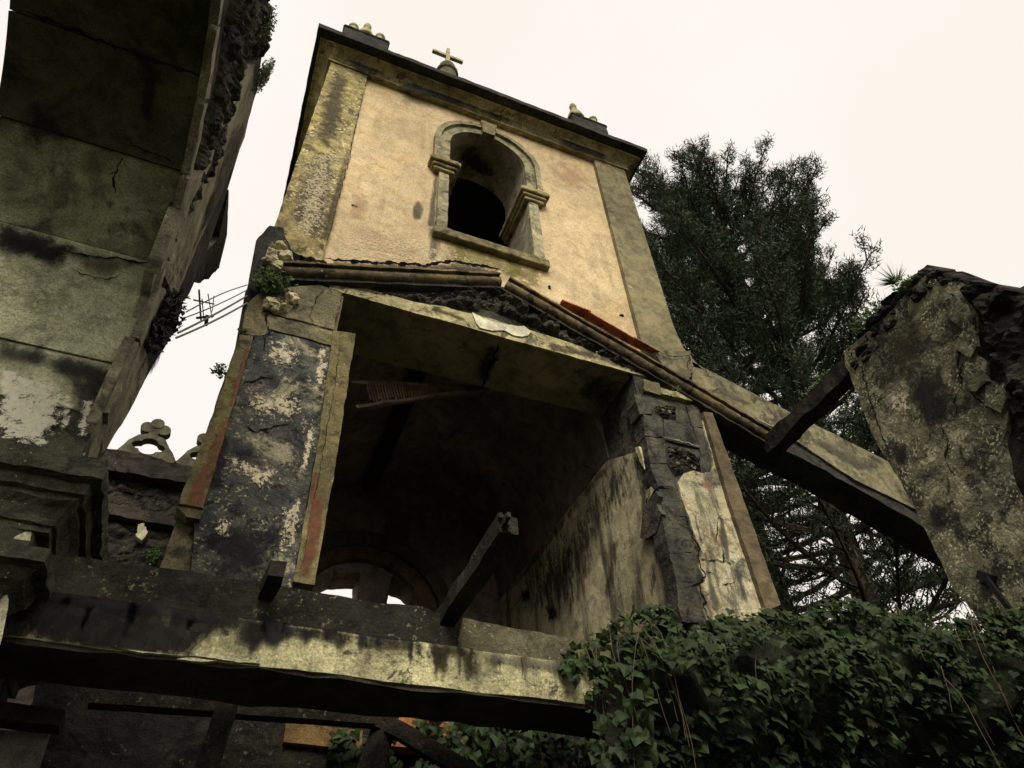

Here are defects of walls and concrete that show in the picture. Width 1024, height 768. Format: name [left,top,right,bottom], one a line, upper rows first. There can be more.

crack [110,143,173,192]
leakage [0,223,130,272]
leakage [414,202,422,218]
spalling [372,287,651,381]
flaking render [0,369,93,446]
crack [855,364,887,446]
flaking render [231,458,277,488]
flaking render [279,499,301,551]
rust [302,473,323,574]
leakage [507,455,639,609]
crack [685,514,734,615]
leakage [3,592,565,680]